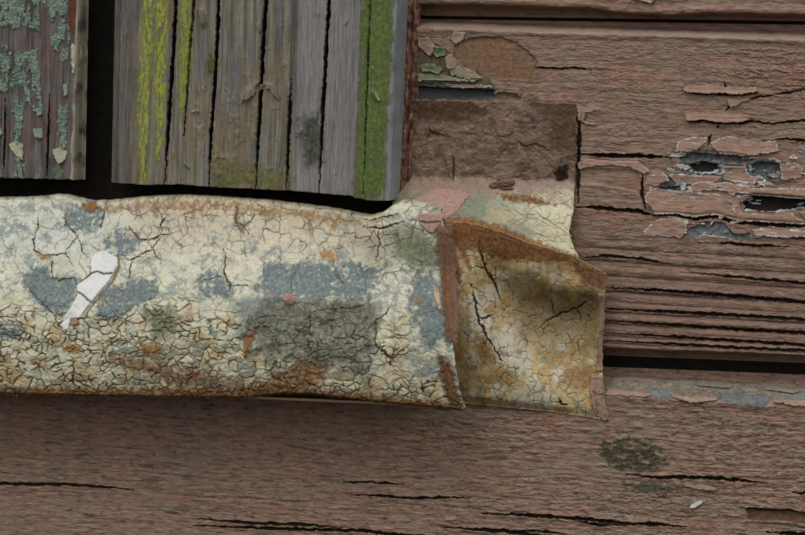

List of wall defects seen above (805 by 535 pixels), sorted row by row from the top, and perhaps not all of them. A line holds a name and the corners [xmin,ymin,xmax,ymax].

peeling [0,0,83,179]
crack [209,0,221,186]
crack [256,0,269,186]
peeling [415,31,537,101]
peeling [683,85,758,123]
crack [32,215,88,282]
crack [123,214,174,278]
corrosion [82,197,352,232]
crack [471,250,508,366]
corrosion [435,217,606,342]
peeling [553,136,805,243]
peeling [589,375,805,421]